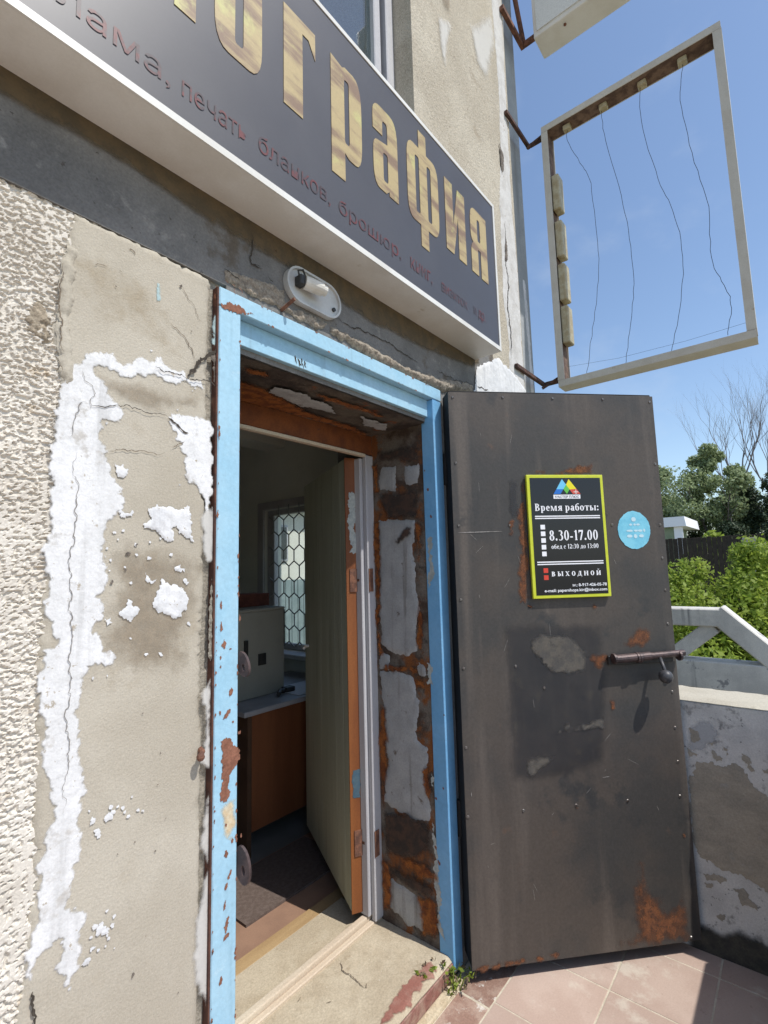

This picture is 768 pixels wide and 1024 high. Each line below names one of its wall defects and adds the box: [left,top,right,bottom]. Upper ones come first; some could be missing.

peeling [115,464,129,478]
flaking render [269,387,335,414]
flaking render [360,416,387,430]
crack [55,265,188,806]
peeling [105,599,140,626]
peeling [124,504,194,626]
corrosion [509,490,532,608]
corrosion [220,737,240,837]
peeling [686,727,768,911]
peeling [432,823,445,940]
corrosion [636,886,686,942]
peeling [381,962,437,1024]